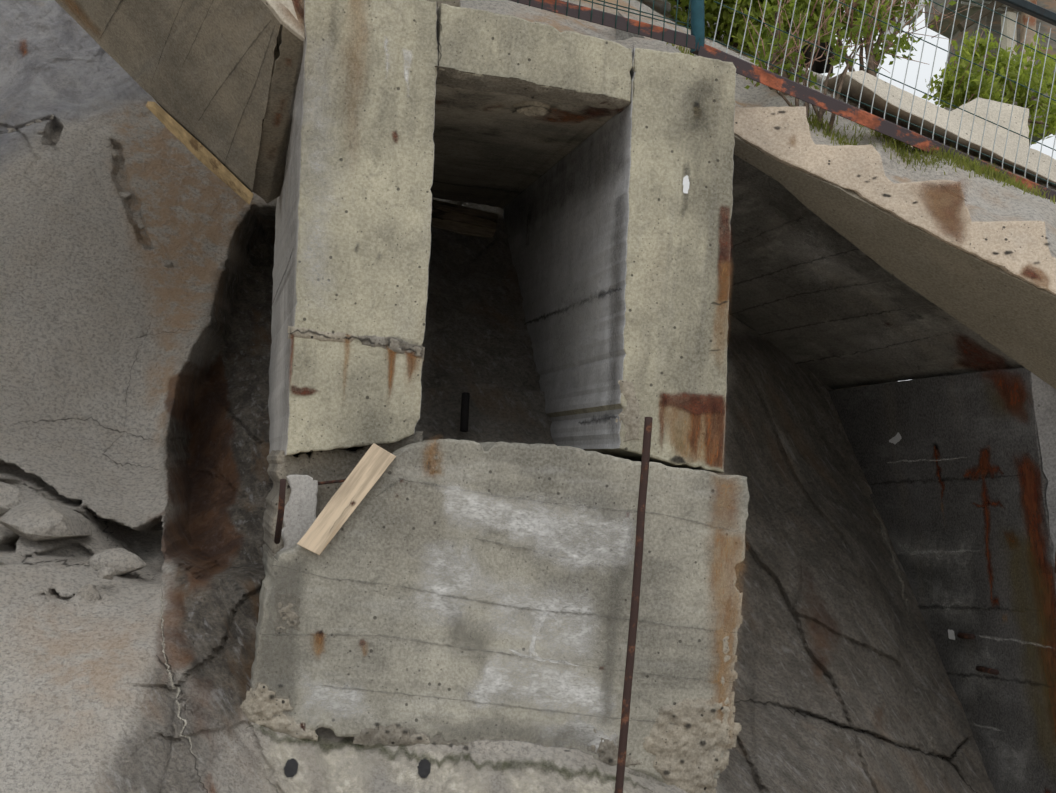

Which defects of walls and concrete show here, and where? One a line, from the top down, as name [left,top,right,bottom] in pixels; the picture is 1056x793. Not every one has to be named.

rust [543,102,623,123]
rust [927,183,966,236]
rust [711,206,731,328]
rust [290,334,316,395]
crack [288,326,425,361]
rust [957,336,1026,414]
rust [660,392,725,468]
rust [963,449,1005,605]
rust [1005,457,1056,755]
spalling [240,682,318,741]
spalling [353,723,484,750]
spalling [538,590,743,793]